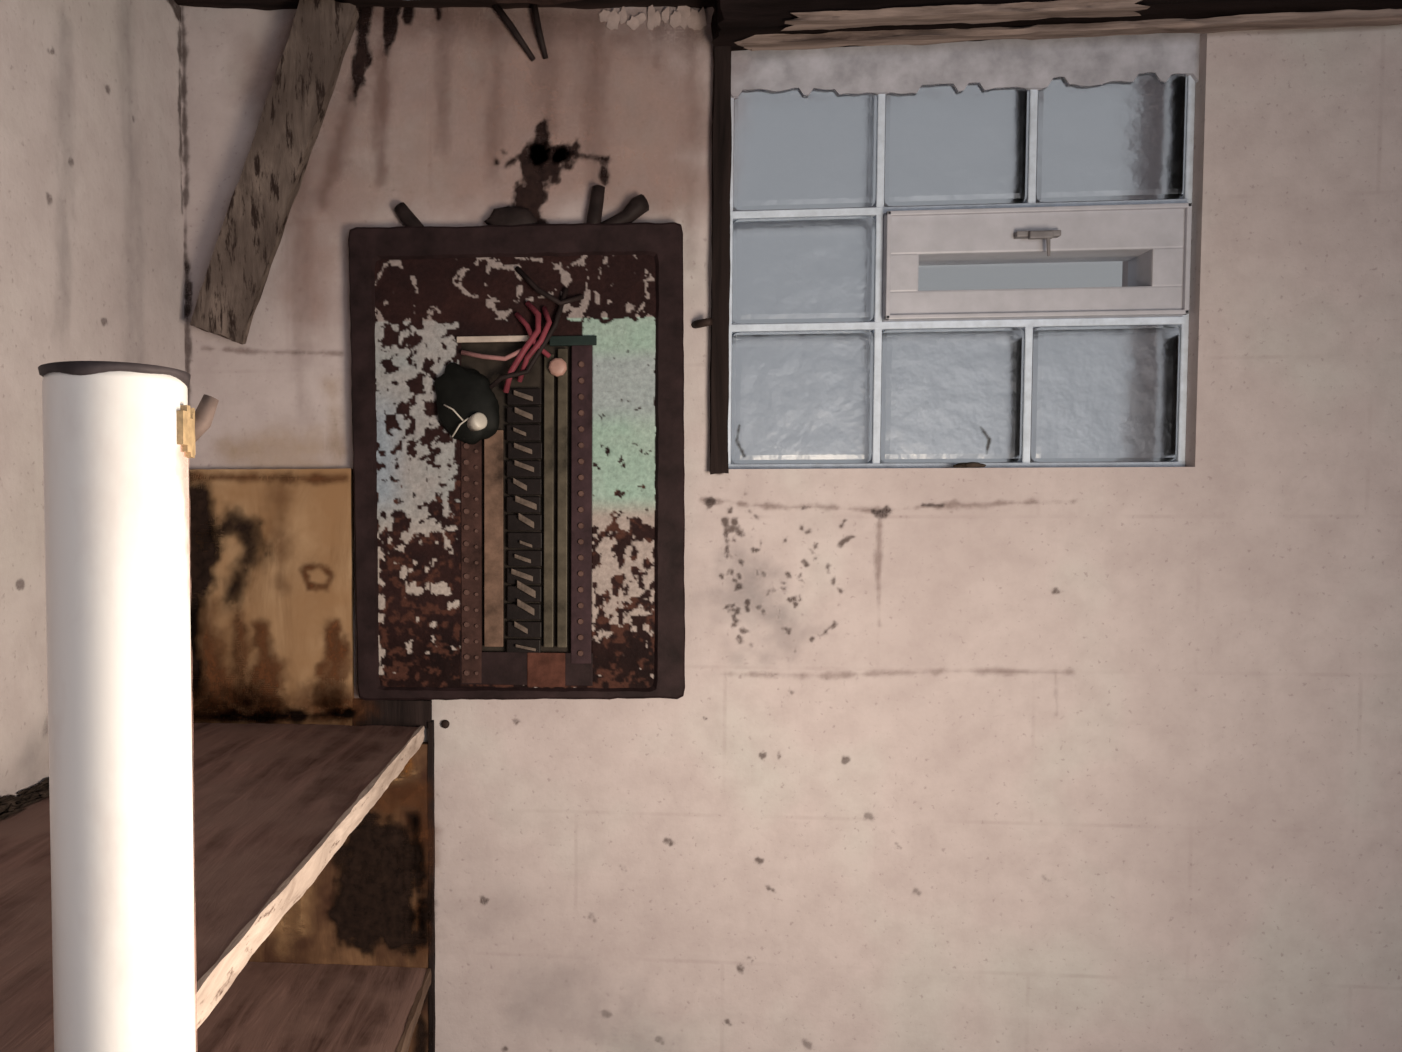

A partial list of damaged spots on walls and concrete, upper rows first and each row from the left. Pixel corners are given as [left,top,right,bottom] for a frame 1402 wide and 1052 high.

water stain [345,7,414,104]
water stain [421,8,689,224]
water stain [706,497,759,639]